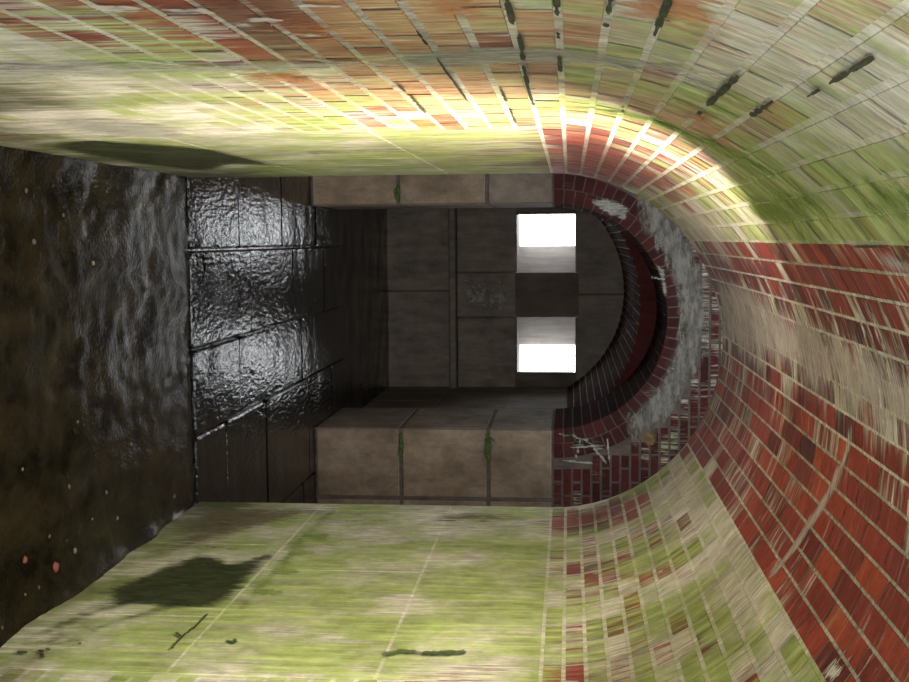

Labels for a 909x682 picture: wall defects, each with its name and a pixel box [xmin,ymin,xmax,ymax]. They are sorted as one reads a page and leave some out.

crack [500,0,536,124]
crack [552,0,563,72]
crack [603,0,613,27]
crack [653,0,673,36]
crack [696,75,739,115]
crack [807,56,875,98]
water stain [56,120,264,170]
water stain [594,200,626,219]
water stain [631,198,708,440]
water stain [716,273,909,436]
water stain [769,432,852,580]
water stain [111,510,309,607]